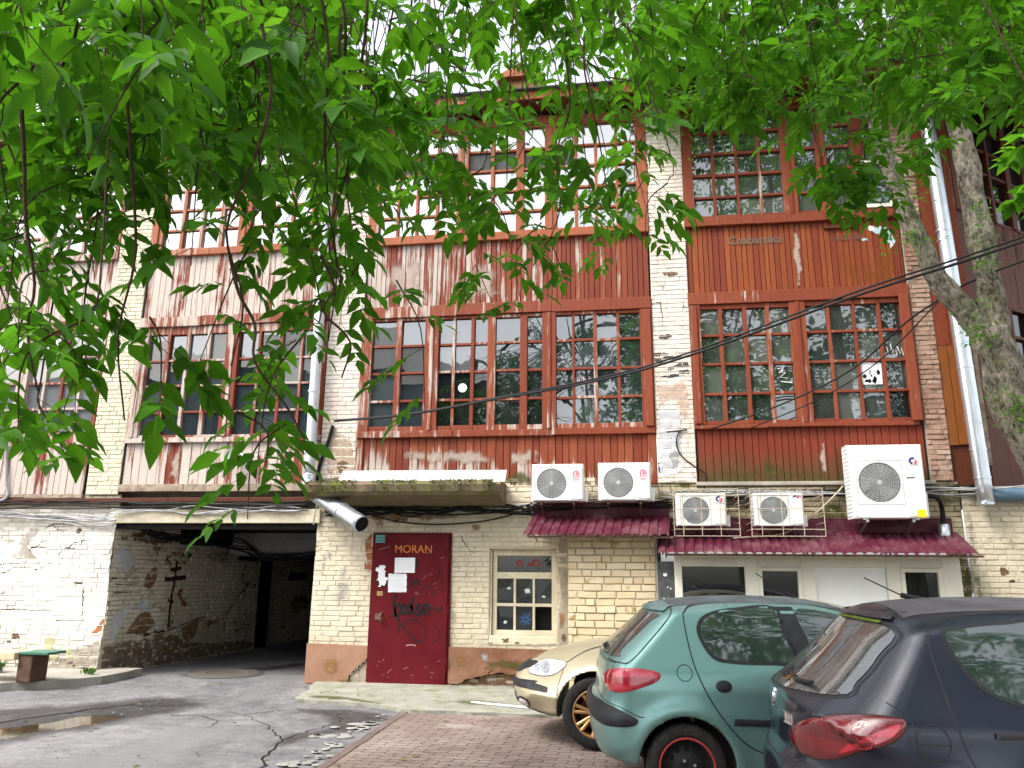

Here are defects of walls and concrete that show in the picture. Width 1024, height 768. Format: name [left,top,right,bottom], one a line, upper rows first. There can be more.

peeling [793,234,802,286]
spalling [653,352,690,416]
peeling [404,451,487,464]
peeling [511,450,539,466]
flaking render [12,529,37,557]
spalling [144,567,157,589]
spalling [48,612,254,669]
crack [0,694,342,768]